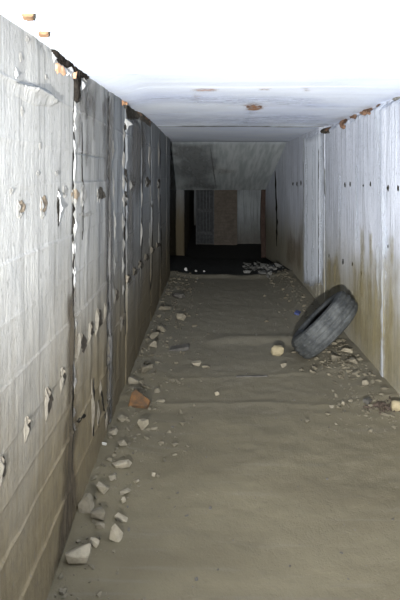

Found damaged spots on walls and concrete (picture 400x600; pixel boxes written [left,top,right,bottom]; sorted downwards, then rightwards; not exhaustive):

spalling [51,49,89,103]
spalling [122,100,151,130]
spalling [40,195,48,219]
spalling [57,185,94,226]
water stain [355,226,388,377]
flaking render [77,289,119,360]
flaking render [45,387,54,423]
flaking render [24,416,32,443]